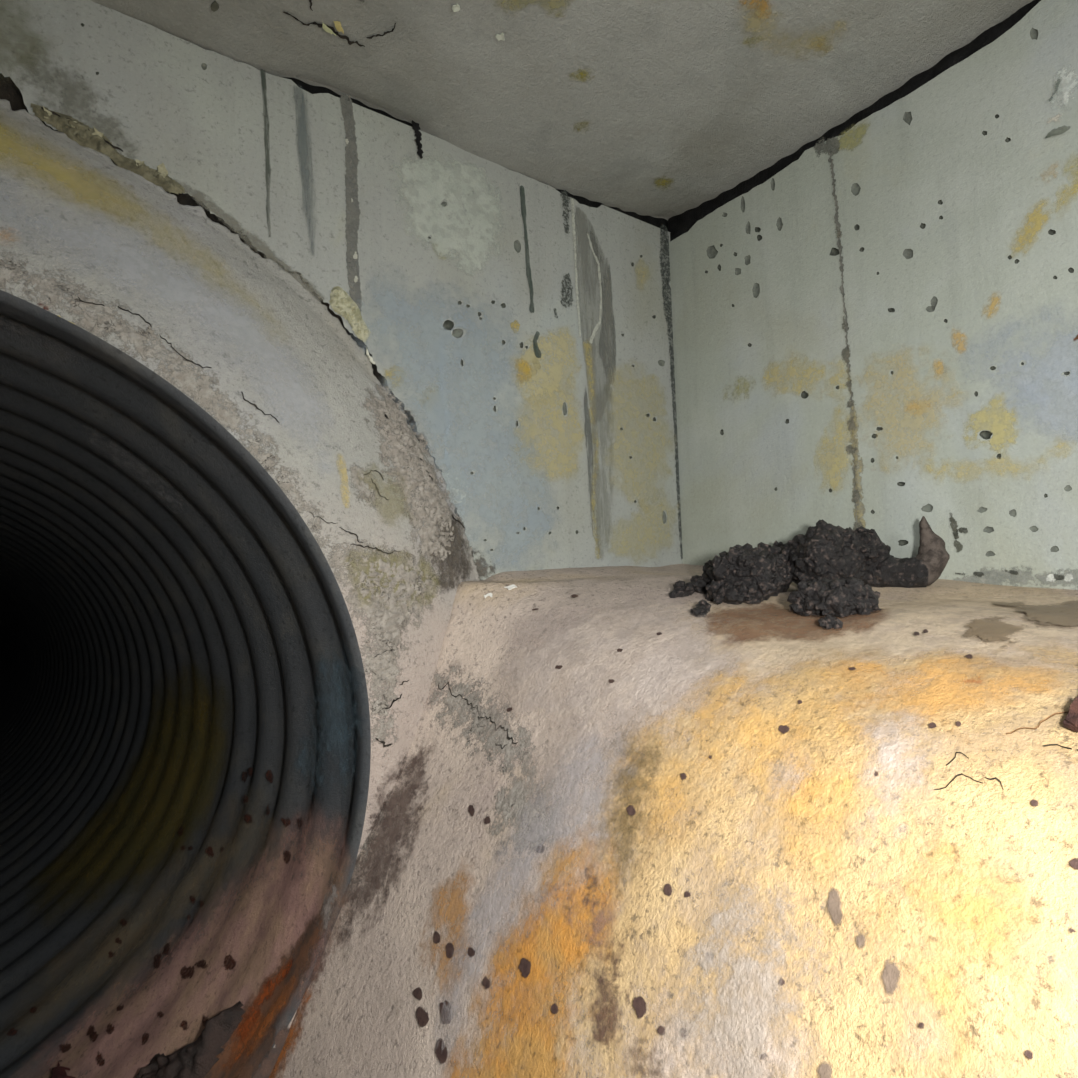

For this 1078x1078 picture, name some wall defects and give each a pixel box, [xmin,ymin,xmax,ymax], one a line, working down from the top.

crack [283,0,396,47]
crack [0,73,123,166]
damp [261,69,271,223]
damp [294,88,310,227]
crack [78,297,211,368]
crack [166,191,442,481]
damp [329,94,616,589]
crack [364,470,388,500]
crack [438,681,518,749]
corrosion [269,953,326,1078]